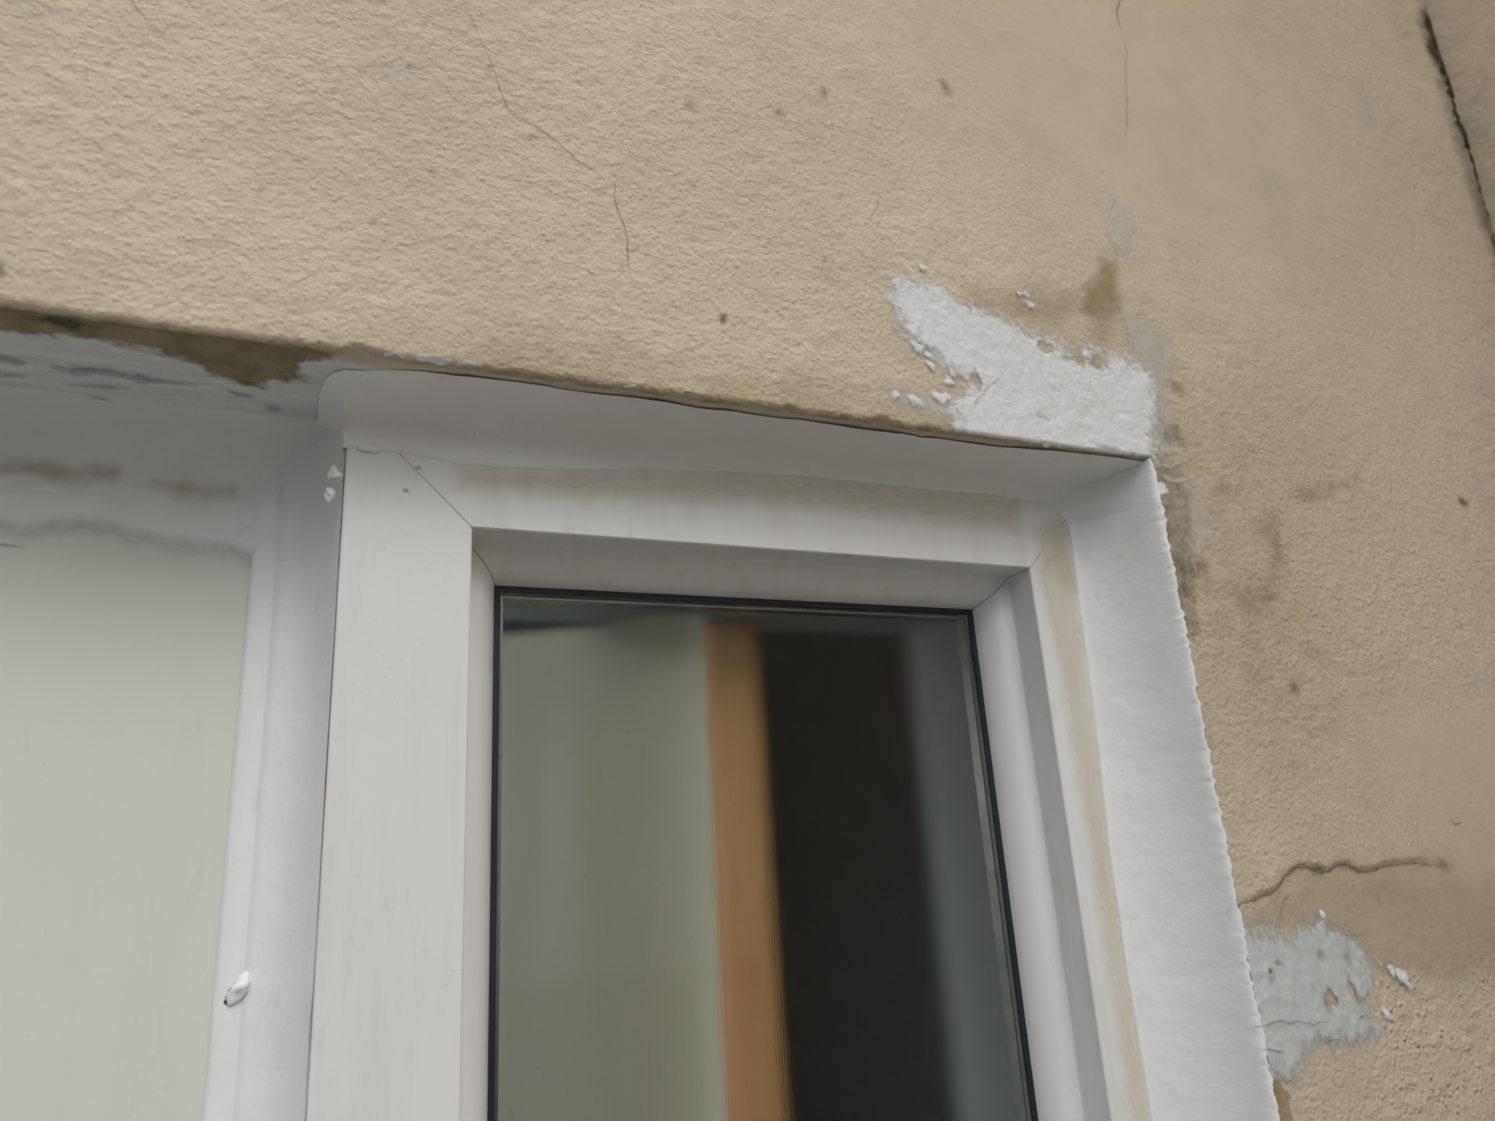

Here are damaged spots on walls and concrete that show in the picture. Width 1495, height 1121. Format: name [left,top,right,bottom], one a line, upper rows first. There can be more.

crack [1423,8,1495,255]
peeling [0,309,344,385]
peeling [384,351,483,367]
peeling [892,341,956,408]
peeling [1378,961,1412,991]